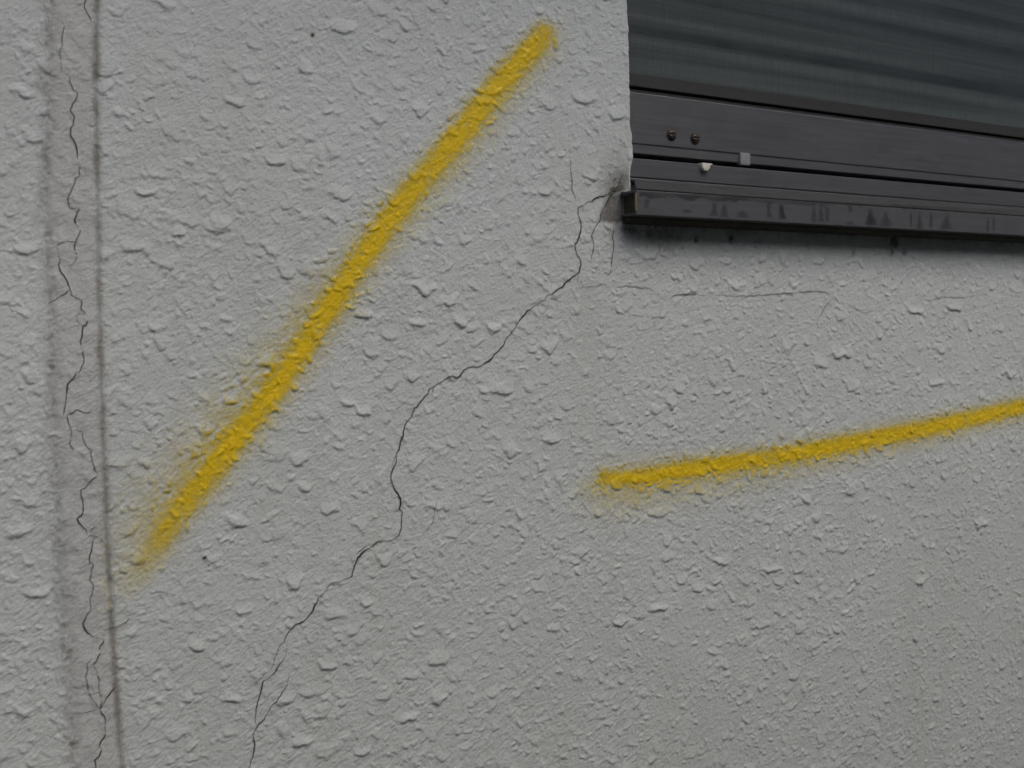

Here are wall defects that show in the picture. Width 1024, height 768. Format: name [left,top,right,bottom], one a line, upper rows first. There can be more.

crack [49,74,97,573]
crack [82,610,129,768]
crack [249,308,532,767]
crack [552,173,614,294]